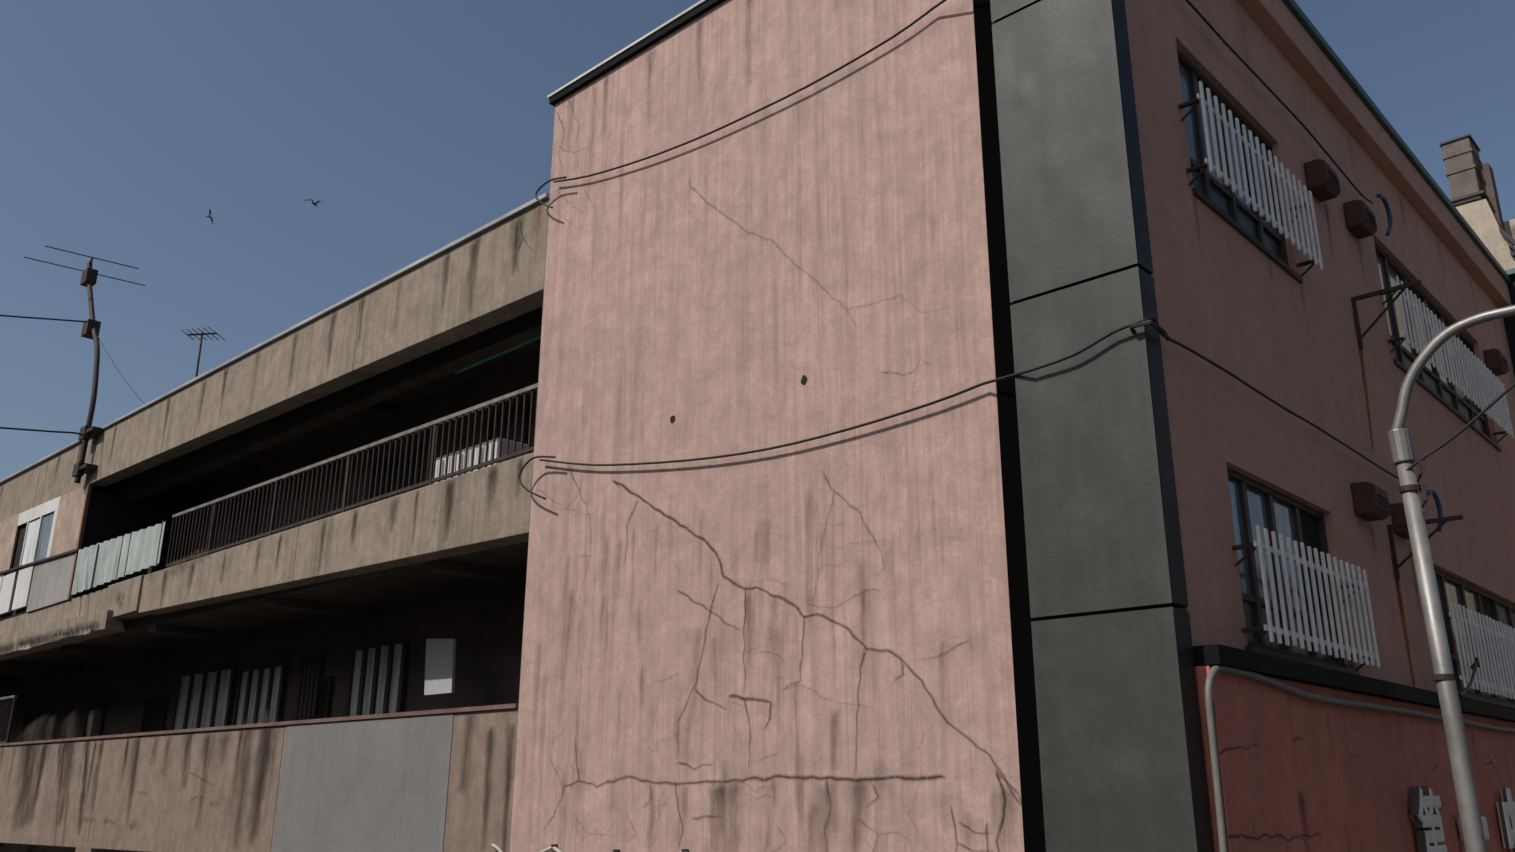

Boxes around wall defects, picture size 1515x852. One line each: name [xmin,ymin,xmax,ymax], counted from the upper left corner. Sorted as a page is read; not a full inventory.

corrosion [1353,315,1373,445]
water stain [0,623,98,652]
crack [614,481,955,728]
corrosion [1392,558,1415,687]
water stain [20,714,103,825]
water stain [238,713,271,833]
crack [567,763,942,819]
crack [952,766,1009,851]